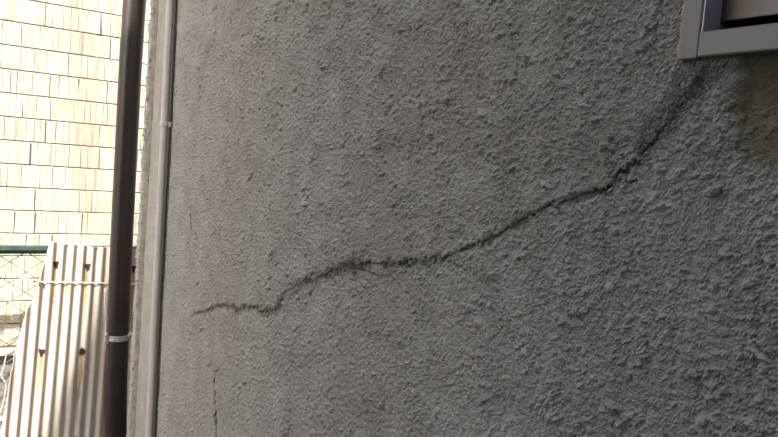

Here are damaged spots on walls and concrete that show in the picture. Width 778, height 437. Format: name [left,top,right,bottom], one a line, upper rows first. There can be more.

crack [196,132,662,314]